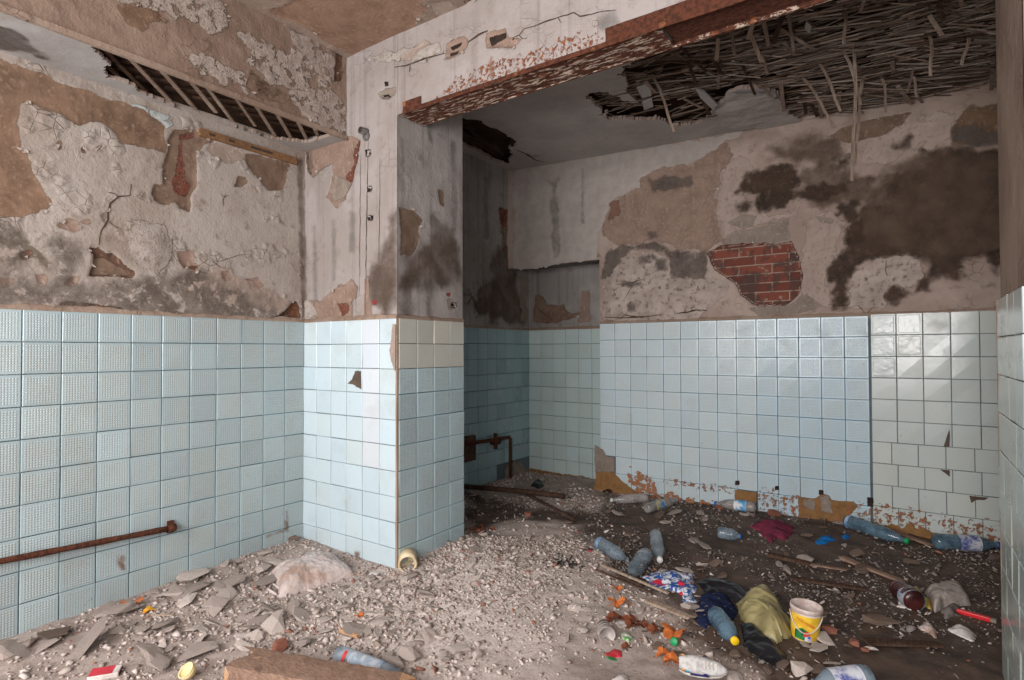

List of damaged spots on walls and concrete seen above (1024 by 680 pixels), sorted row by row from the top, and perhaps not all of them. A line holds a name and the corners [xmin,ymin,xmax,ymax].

crack [512,10,614,40]
crack [394,53,445,73]
corrosion [435,32,603,99]
peeling [96,0,476,208]
peeling [0,59,290,218]
crack [99,189,131,244]
leakage [735,135,1000,310]
leakage [368,218,461,315]
leakage [465,247,524,324]
peeling [594,445,757,512]
corrosion [757,486,804,517]
corrosion [843,501,1000,541]